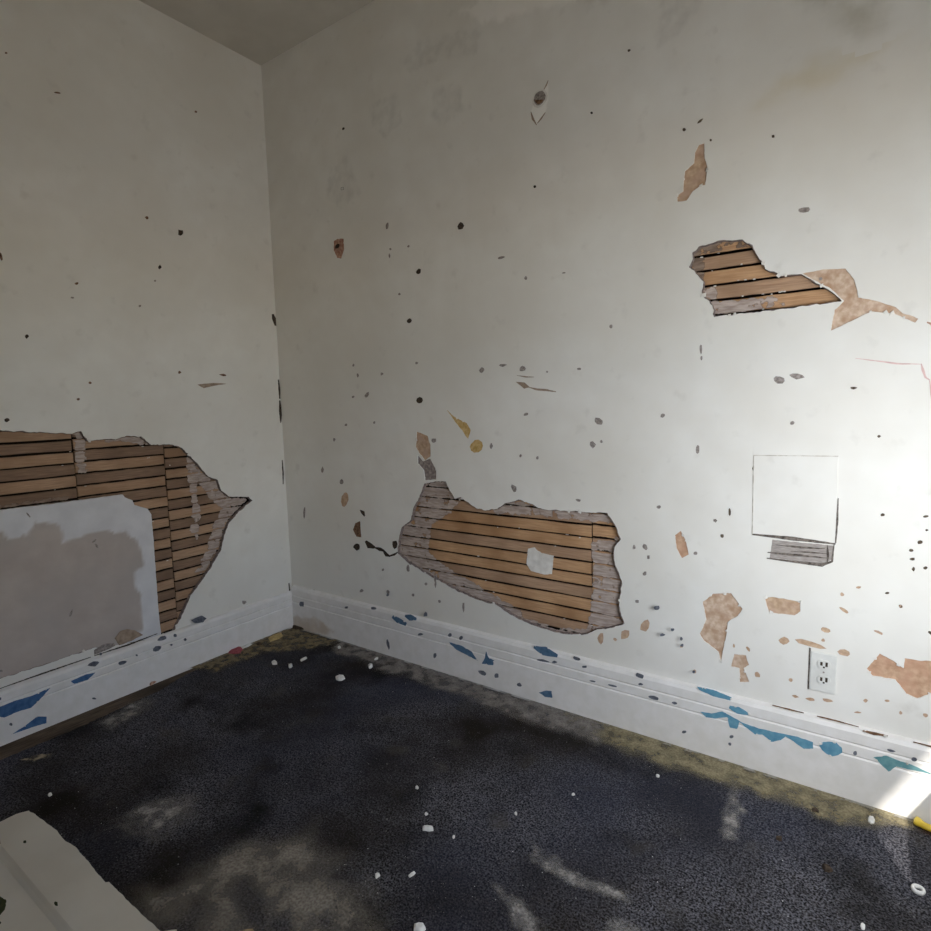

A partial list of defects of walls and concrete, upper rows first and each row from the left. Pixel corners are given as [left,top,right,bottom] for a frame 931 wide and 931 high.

flaking render [675,139,712,202]
flaking render [0,430,253,652]
flaking render [398,432,629,644]
flaking render [0,629,144,684]
peeling [392,612,427,626]
peeling [534,645,558,663]
flaking render [700,592,760,682]
flaking render [867,654,931,698]
peeling [0,688,50,734]
peeling [697,687,842,757]
peeling [874,749,931,774]